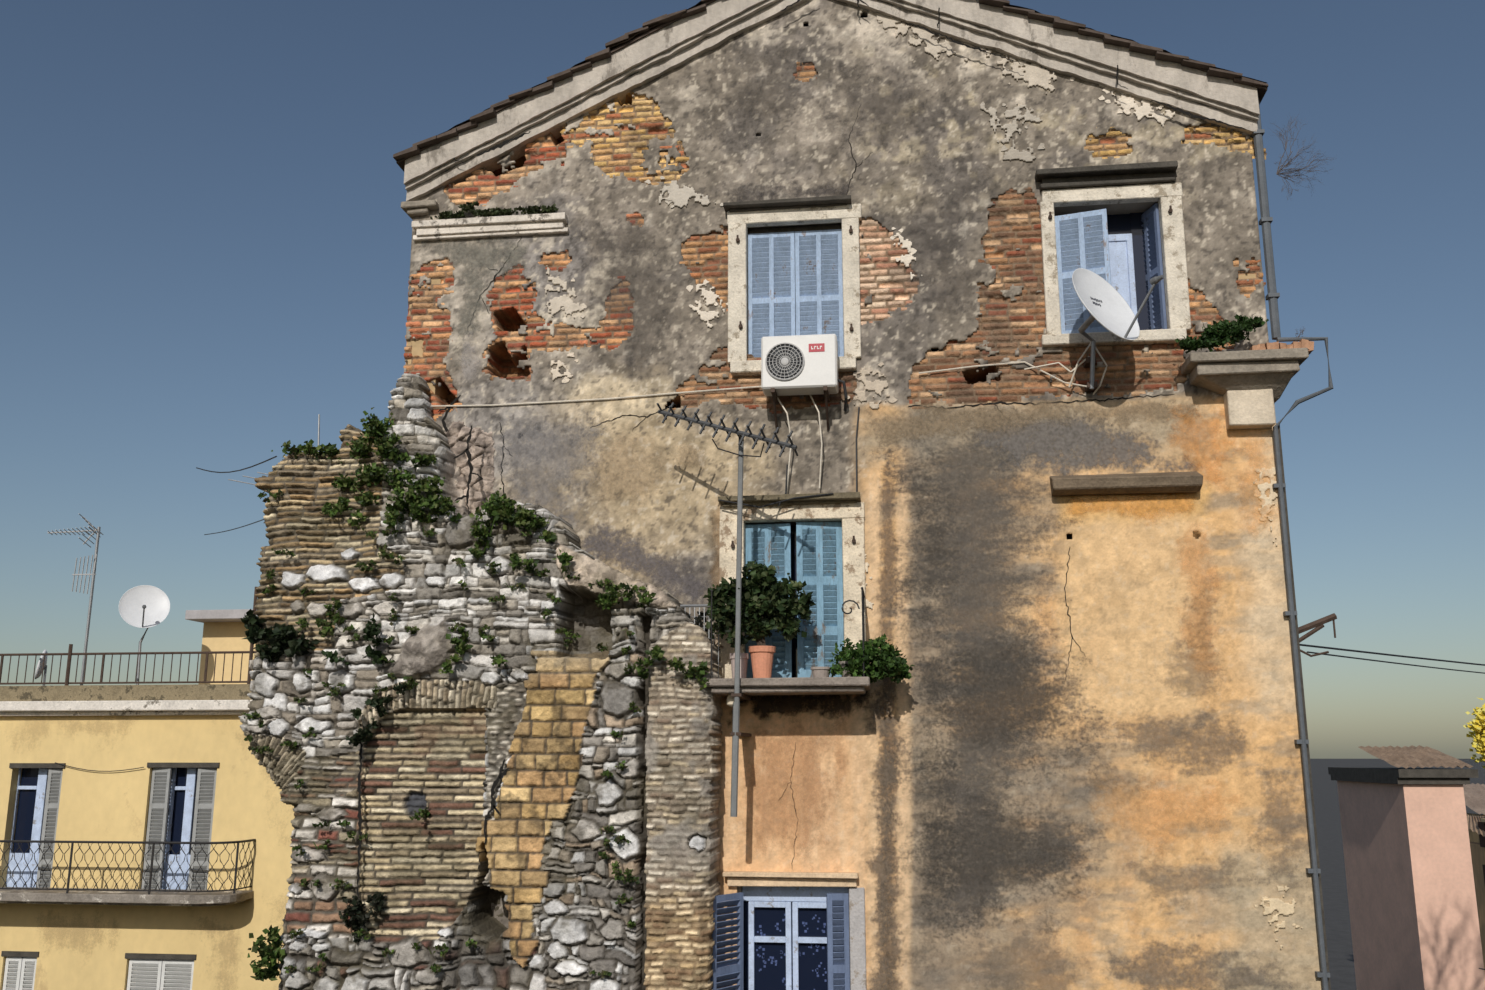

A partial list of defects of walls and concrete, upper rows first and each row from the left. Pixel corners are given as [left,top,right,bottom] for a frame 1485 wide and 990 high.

spalling [793,62,818,82]
flaking render [444,92,723,208]
flaking render [403,257,462,422]
flaking render [482,250,635,383]
flaking render [670,187,1235,414]
flaking render [1233,258,1266,298]
crack [438,395,512,514]
leakage [718,492,861,507]
leakage [872,401,1196,925]
crack [1064,548,1085,680]
crack [778,742,798,864]
leakage [722,677,901,990]